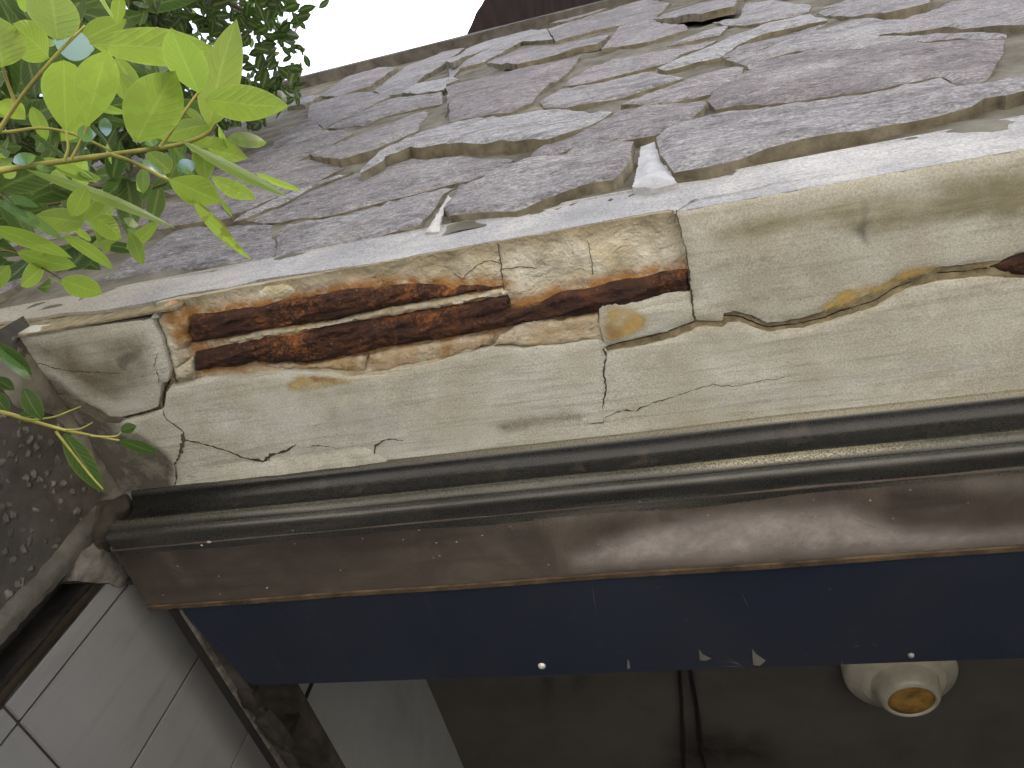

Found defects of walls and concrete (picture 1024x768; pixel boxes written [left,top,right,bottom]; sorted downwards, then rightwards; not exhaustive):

spalling [155,210,688,382]
corrosion [191,269,690,371]
crack [592,175,1024,424]
corrosion [823,268,929,309]
corrosion [990,252,1024,275]
crack [36,357,339,485]